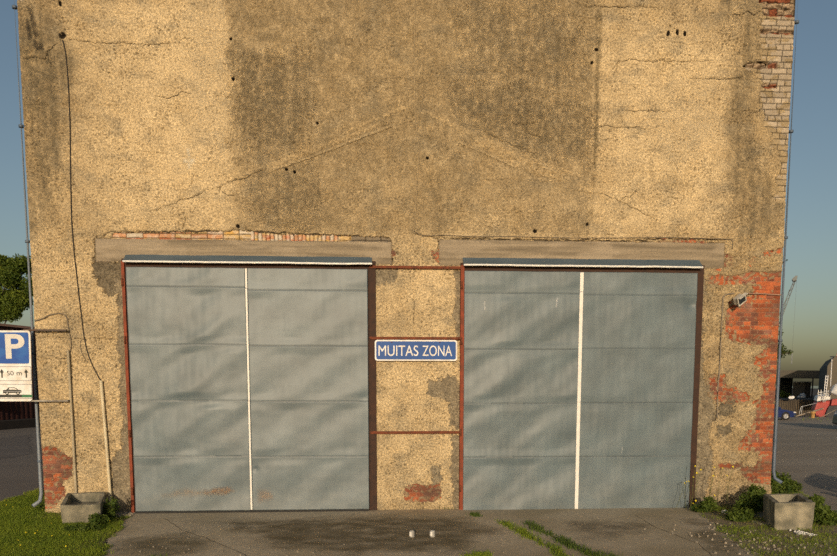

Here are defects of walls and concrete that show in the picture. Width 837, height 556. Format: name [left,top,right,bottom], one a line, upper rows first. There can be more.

flaking render [744,0,795,202]
crack [102,159,341,238]
flaking render [42,444,73,509]
flaking render [404,375,459,509]
flaking render [695,254,782,505]